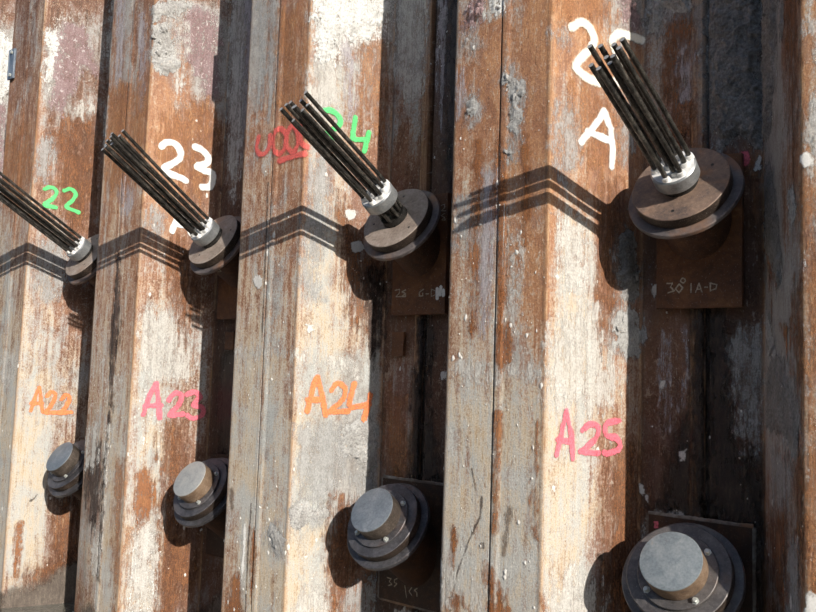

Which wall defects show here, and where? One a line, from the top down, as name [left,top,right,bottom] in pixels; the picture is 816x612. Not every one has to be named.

corrosion [155,97,220,215]
water stain [441,0,457,190]
water stain [364,265,387,383]
water stain [0,562,77,609]
corrosion [12,496,79,589]
corrosion [110,419,198,612]
water stain [202,590,222,612]
corrosion [323,491,360,612]
corrosion [492,410,503,536]
corrosion [592,442,652,612]
water stain [656,308,766,612]
corrosion [793,443,816,595]